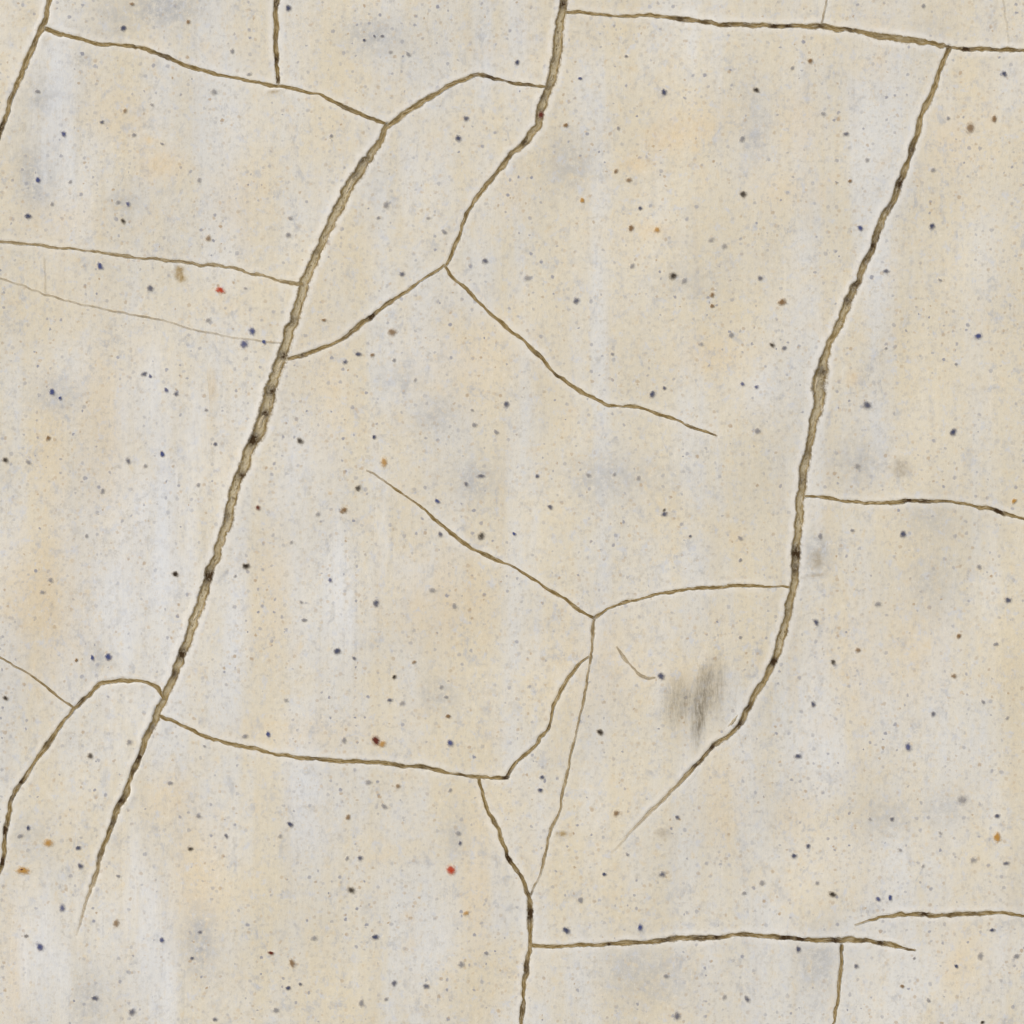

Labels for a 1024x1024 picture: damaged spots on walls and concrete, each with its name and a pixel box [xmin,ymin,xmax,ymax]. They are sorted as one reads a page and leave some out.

crack [0,0,789,902]
crack [287,0,1024,825]
crack [477,776,915,1024]
crack [857,911,1024,924]